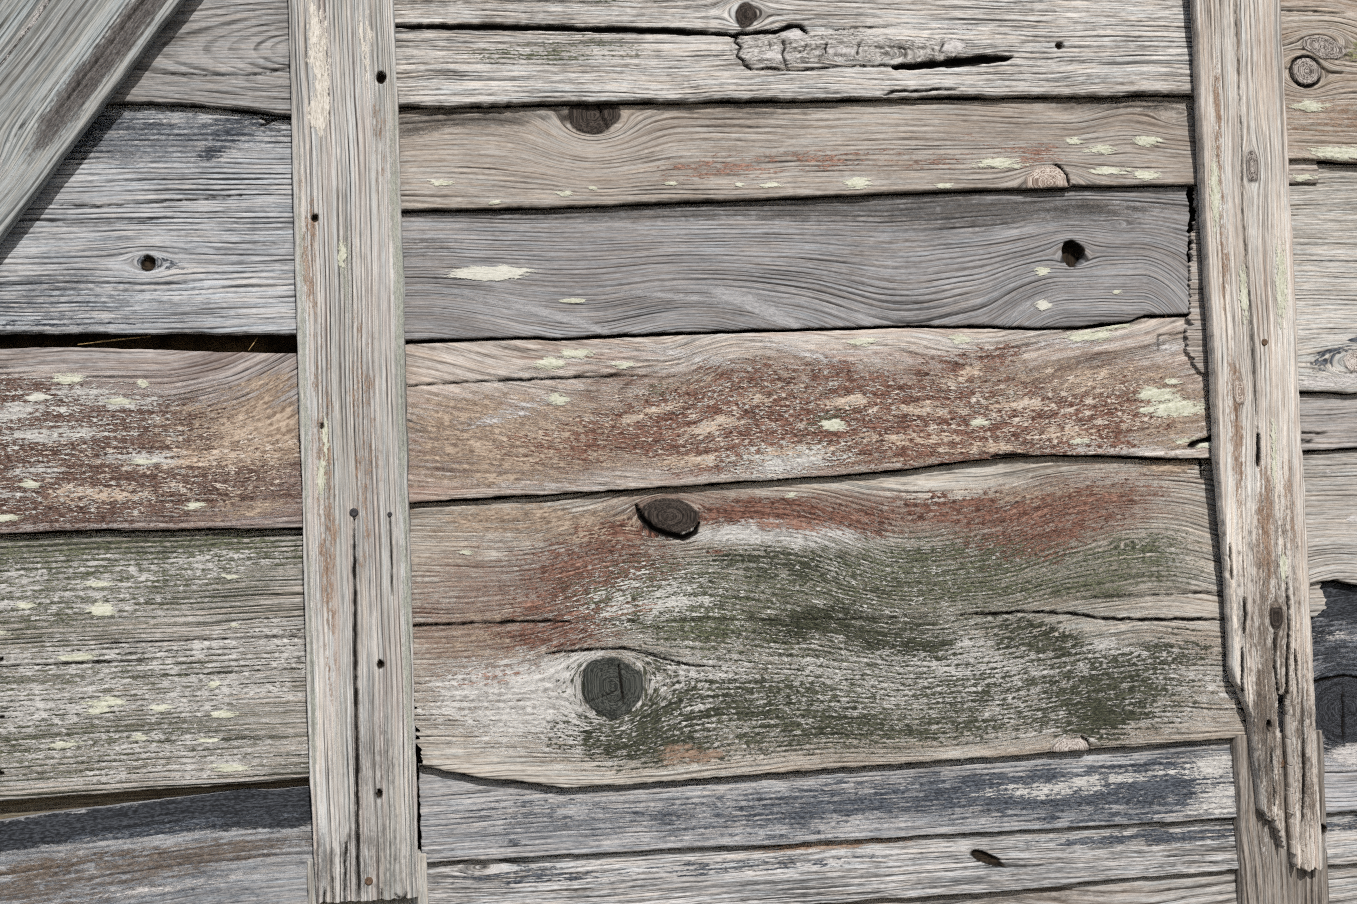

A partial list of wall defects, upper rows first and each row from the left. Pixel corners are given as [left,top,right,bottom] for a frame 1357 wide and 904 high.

crack [395,1,1011,95]
damp [1213,75,1229,310]
damp [1310,337,1357,371]
damp [407,338,1211,546]
crack [323,518,407,903]
crack [413,620,715,703]
damp [625,609,766,646]
crack [750,546,1357,820]
damp [1086,535,1178,563]
damp [1226,355,1357,852]
damp [437,862,602,889]
damp [479,744,1235,879]